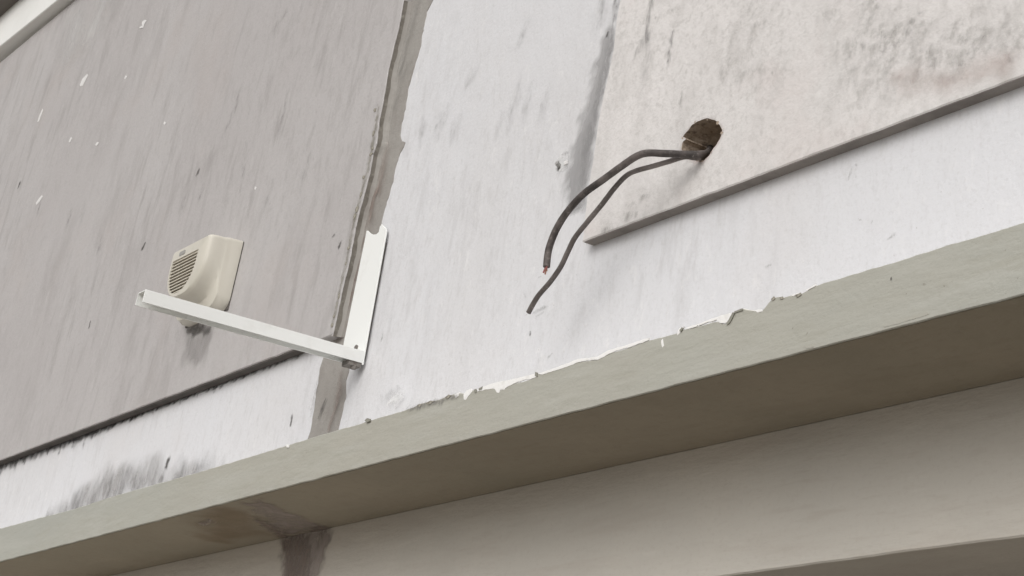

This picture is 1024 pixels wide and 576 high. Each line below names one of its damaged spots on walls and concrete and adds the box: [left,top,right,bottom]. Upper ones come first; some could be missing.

leakage [569,32,611,211]
spalling [677,308,762,335]
peeling [417,338,664,407]